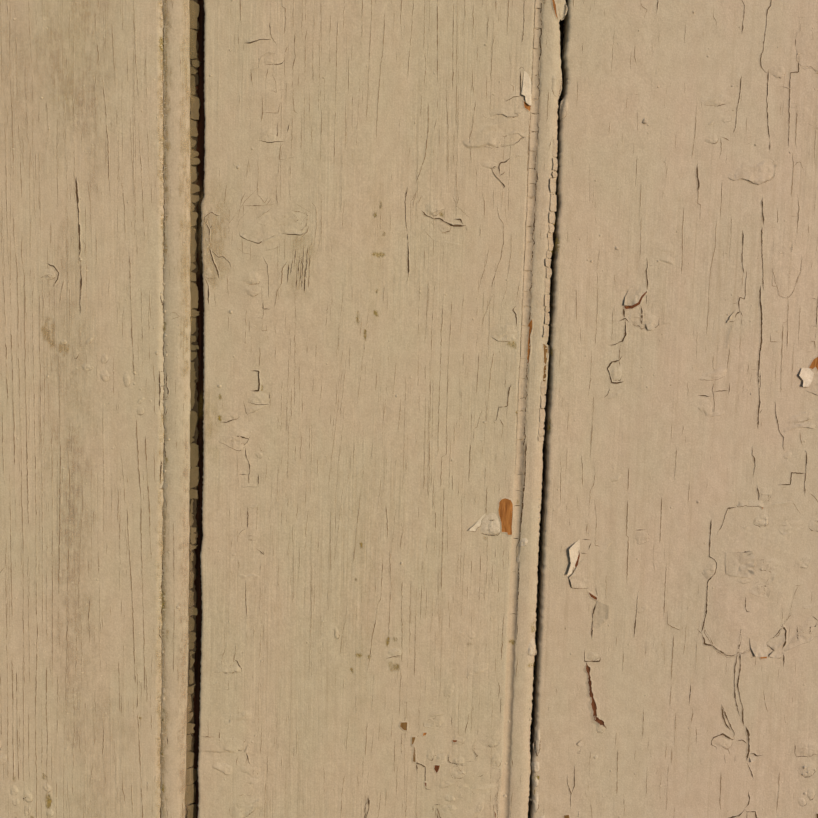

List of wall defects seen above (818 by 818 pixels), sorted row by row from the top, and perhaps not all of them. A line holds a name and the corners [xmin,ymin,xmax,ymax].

peeling [518,67,532,112]
peeling [243,369,270,415]
peeling [799,353,818,395]
crack [671,424,708,502]
crack [734,448,756,483]
peeling [468,497,514,537]
peeling [567,538,609,637]
peeling [697,486,818,666]
crack [554,468,796,818]
peeling [398,709,504,818]
peeling [727,789,774,818]